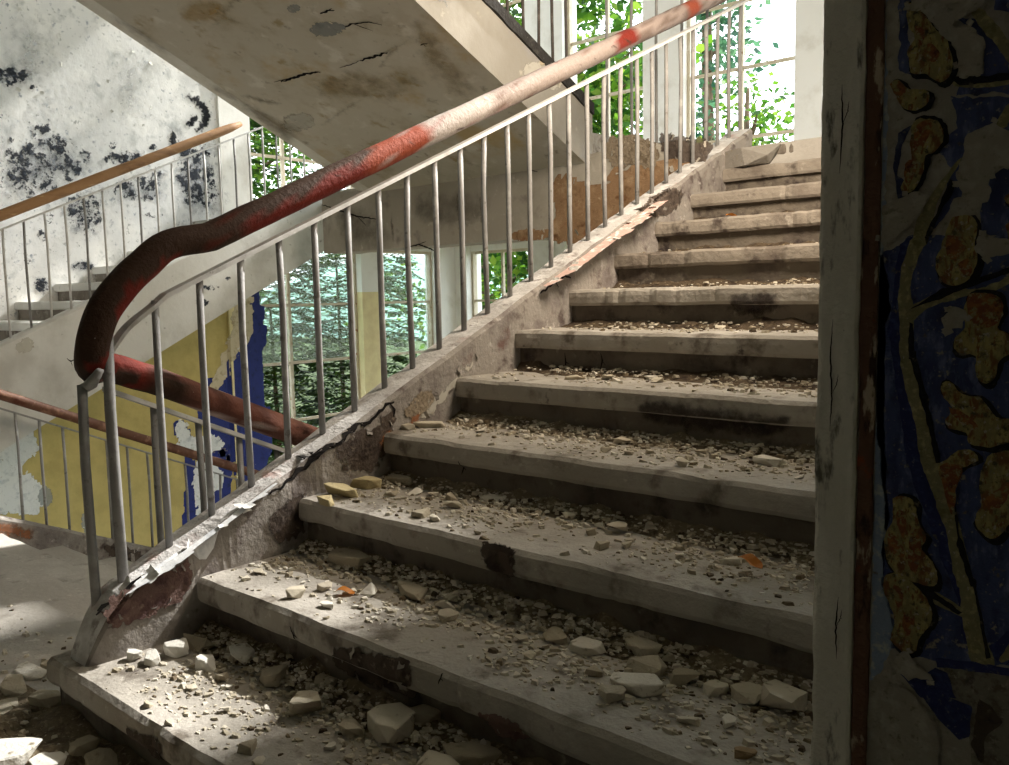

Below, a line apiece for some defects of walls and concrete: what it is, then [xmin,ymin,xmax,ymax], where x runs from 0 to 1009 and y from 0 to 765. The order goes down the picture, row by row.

crack [275,52,388,82]
crack [316,8,381,37]
peeling [903,0,986,79]
peeling [952,117,1009,212]
flaking render [512,133,713,286]
peeling [875,188,937,244]
peeling [0,432,53,515]
peeling [175,419,225,515]
crack [269,401,396,494]
spalling [101,483,278,628]
spalling [480,541,516,578]
spalling [332,644,417,699]